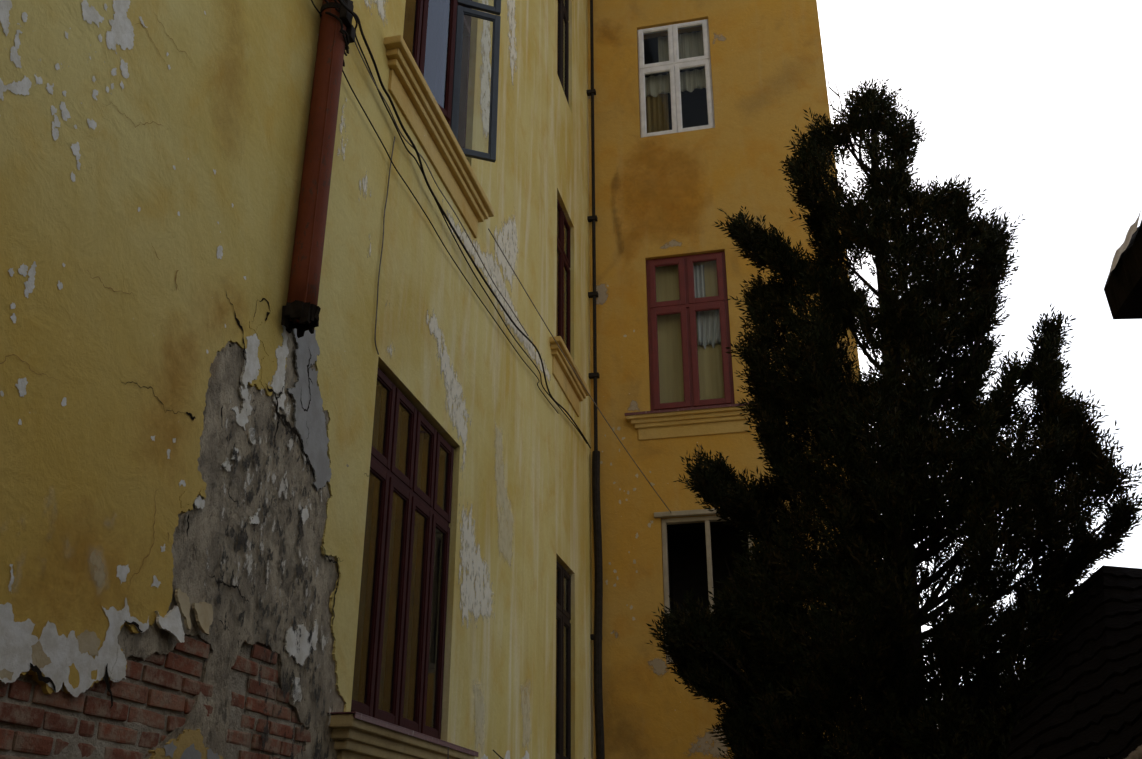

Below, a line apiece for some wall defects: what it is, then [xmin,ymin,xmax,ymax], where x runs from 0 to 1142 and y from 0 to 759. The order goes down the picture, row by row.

peeling [0,0,97,182]
peeling [81,0,148,100]
peeling [8,261,37,324]
crack [121,292,313,471]
peeling [426,310,471,469]
flaking render [0,320,344,759]
peeling [459,503,494,628]